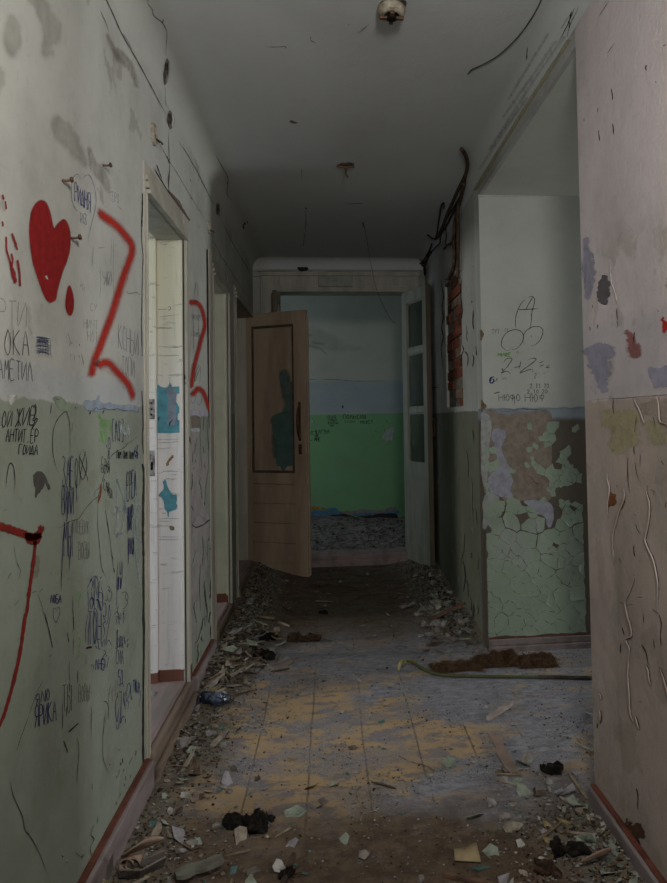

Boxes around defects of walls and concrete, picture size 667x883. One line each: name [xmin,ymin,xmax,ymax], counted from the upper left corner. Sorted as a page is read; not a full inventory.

flaking render [441,261,463,407]
peeling [582,238,611,305]
peeling [583,343,614,392]
peeling [157,379,209,524]
crack [160,416,212,664]
peeling [480,400,587,637]
crack [595,394,667,730]